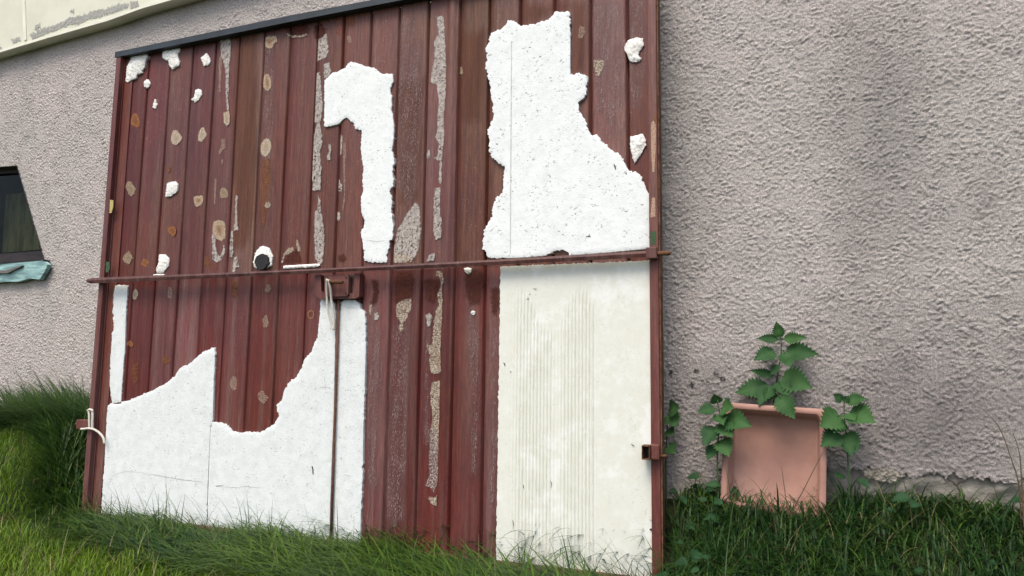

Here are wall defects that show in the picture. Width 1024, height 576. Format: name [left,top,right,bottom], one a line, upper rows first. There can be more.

peeling [212,195,239,272]
peeling [312,34,346,264]
peeling [367,16,446,526]
spalling [863,467,905,483]